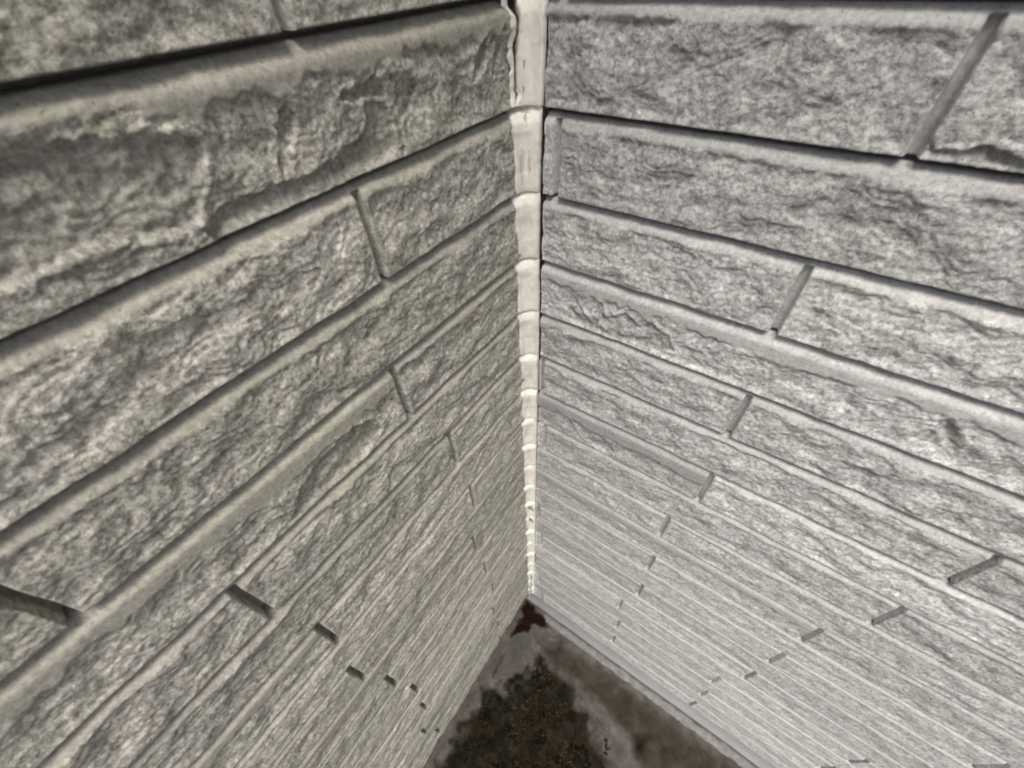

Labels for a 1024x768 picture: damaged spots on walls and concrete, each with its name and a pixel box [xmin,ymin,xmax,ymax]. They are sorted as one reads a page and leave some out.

corrosion [511,600,548,637]